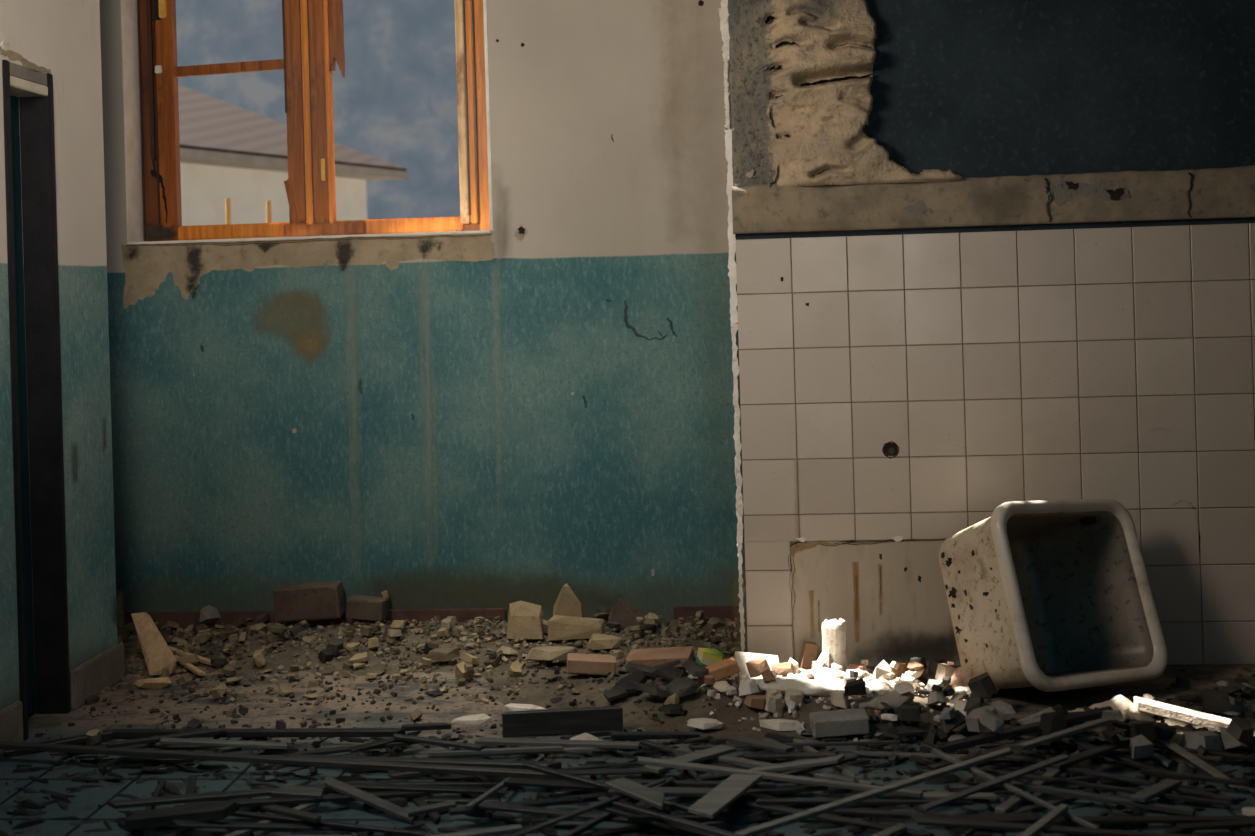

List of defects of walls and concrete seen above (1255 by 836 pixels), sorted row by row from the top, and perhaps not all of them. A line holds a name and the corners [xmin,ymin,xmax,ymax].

peeling [121,233,495,309]
crack [624,301,678,341]
peeling [788,535,961,667]